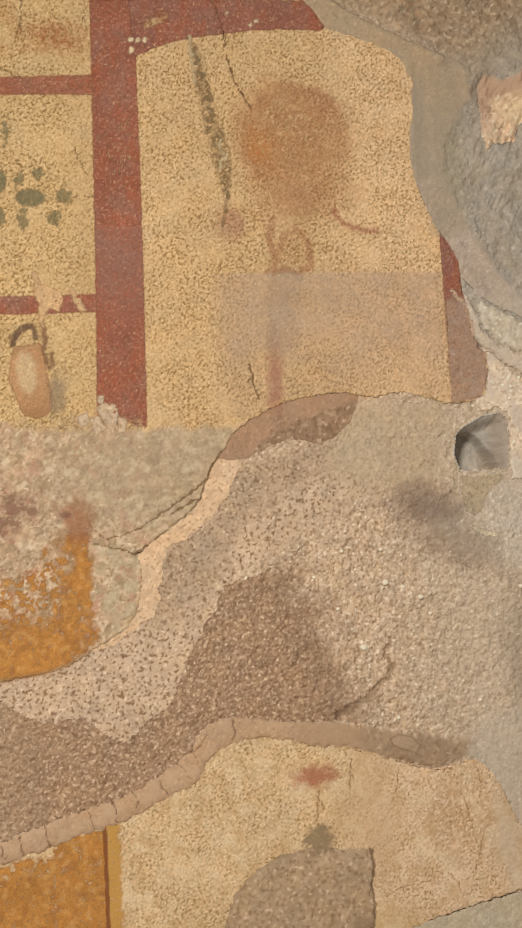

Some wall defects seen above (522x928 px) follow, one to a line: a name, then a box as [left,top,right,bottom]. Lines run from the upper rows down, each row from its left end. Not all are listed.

crack [211,1,251,108]
peeling [76,395,127,436]
crack [100,451,222,555]
spalling [91,458,243,651]
spalling [453,412,510,489]
spalling [0,570,356,843]